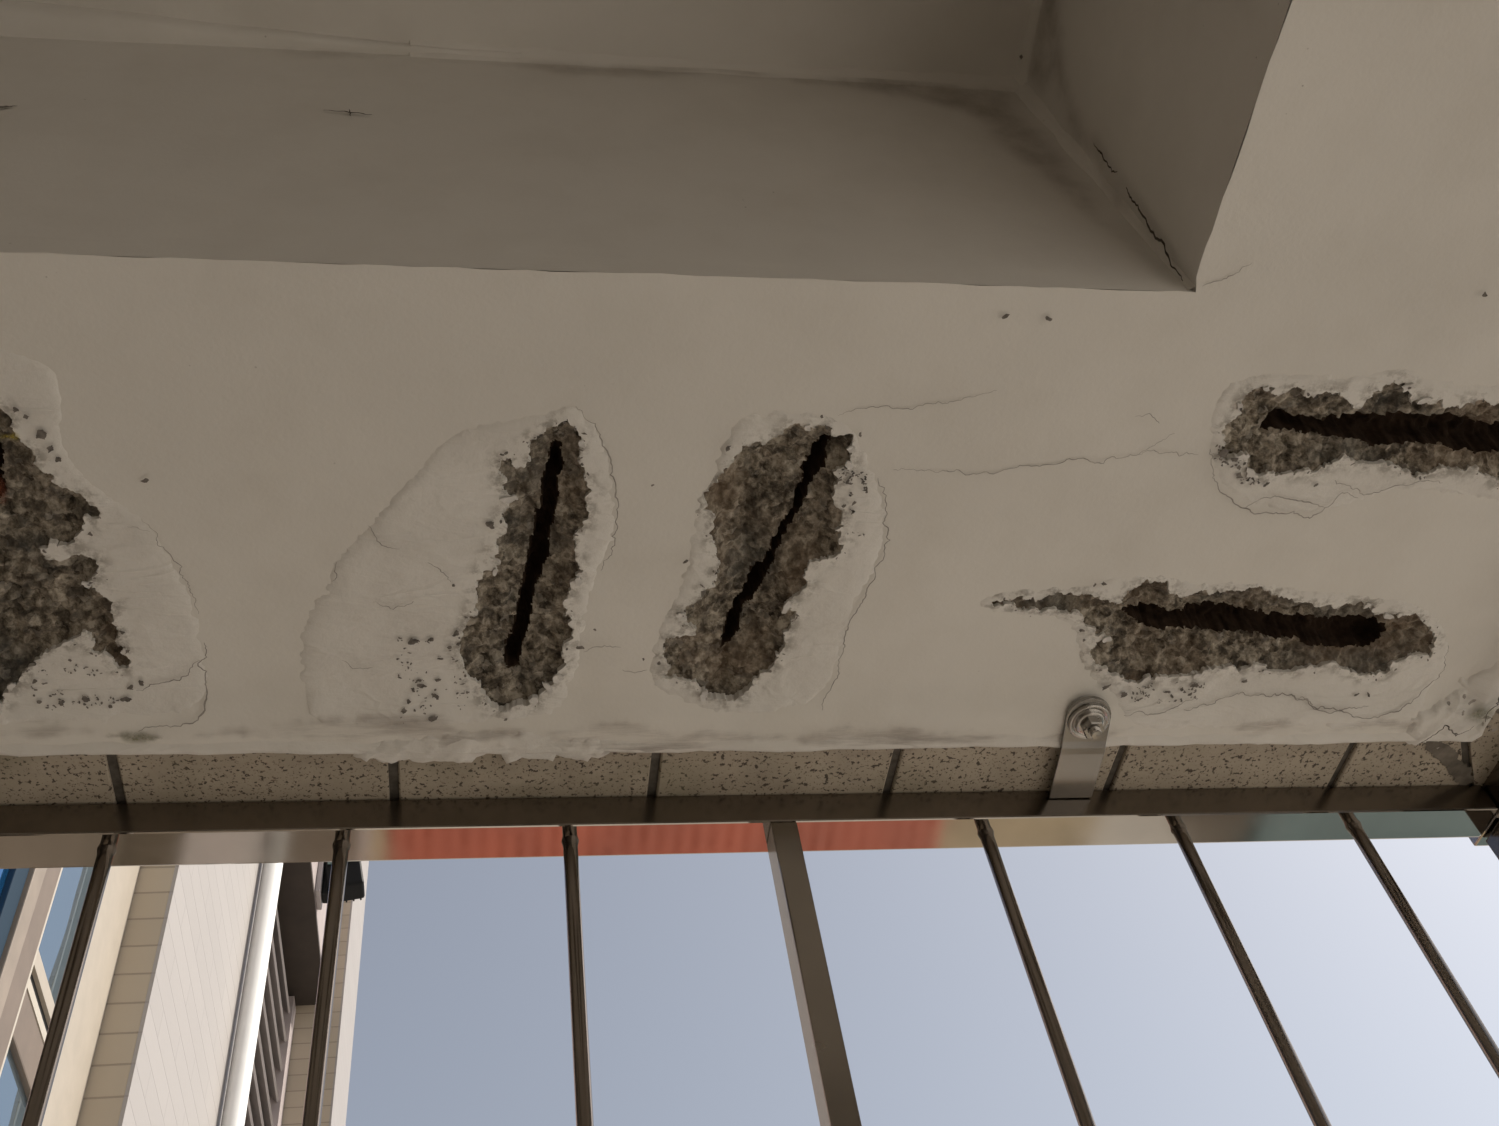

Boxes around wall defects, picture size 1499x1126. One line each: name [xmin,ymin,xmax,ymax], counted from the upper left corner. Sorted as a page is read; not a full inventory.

spalling [0,348,208,725]